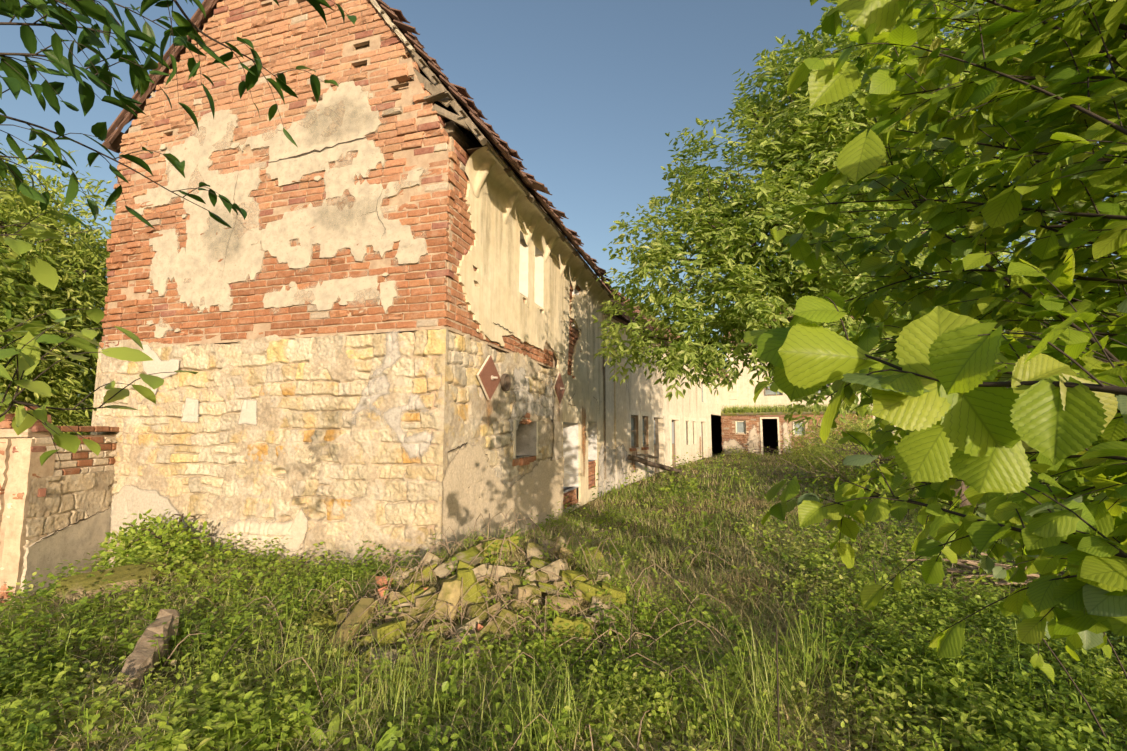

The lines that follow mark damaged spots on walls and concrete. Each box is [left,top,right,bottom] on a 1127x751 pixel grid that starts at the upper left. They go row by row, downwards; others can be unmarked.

flaking render [134,81,428,314]
flaking render [142,317,180,394]
spalling [567,281,582,378]
flaking render [181,398,199,422]
flaking render [238,400,257,425]
flaking render [275,509,308,563]